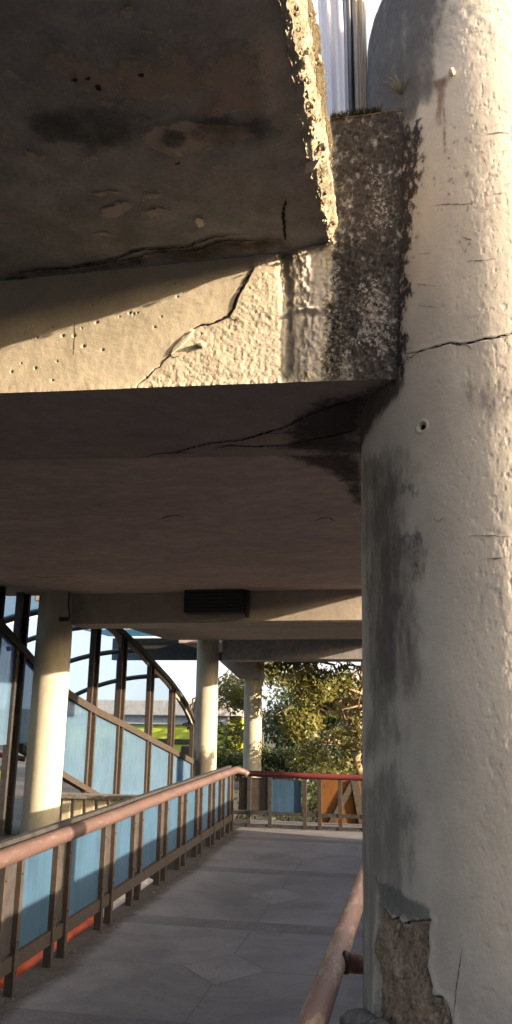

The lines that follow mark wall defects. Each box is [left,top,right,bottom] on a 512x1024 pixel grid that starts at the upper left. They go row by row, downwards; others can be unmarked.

rust [435,67,455,113]
leakage [4,0,440,384]
crack [140,270,253,383]
crack [407,333,512,358]
crack [144,392,374,458]
leakage [287,454,361,504]
spalling [376,908,452,1024]